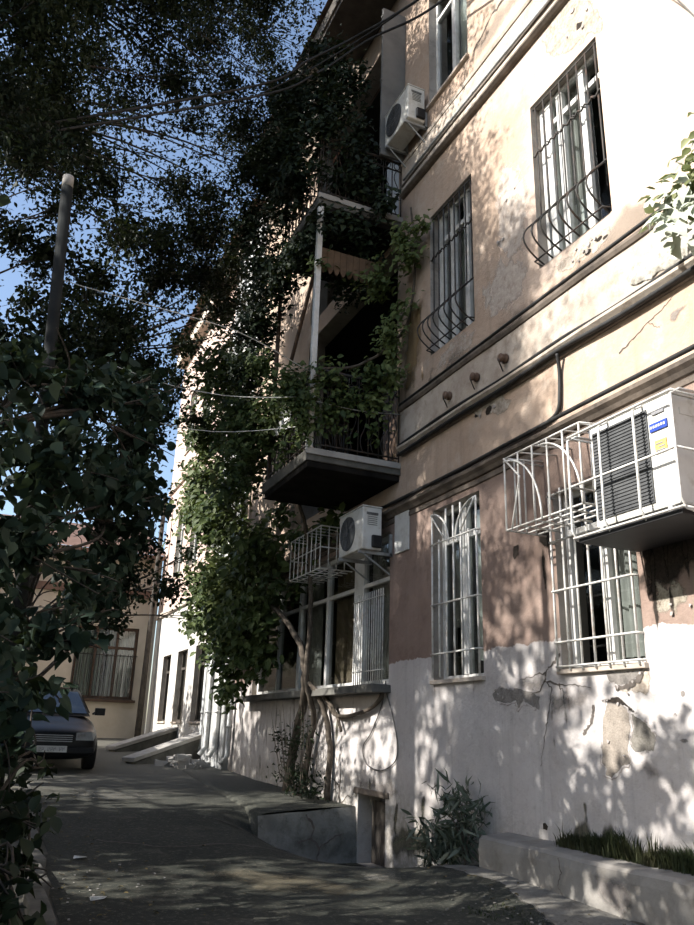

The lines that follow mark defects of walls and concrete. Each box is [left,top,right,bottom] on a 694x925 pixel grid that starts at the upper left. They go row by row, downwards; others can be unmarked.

flaking render [542,0,603,56]
crack [619,291,677,354]
damp [639,538,694,625]
flaking render [493,679,542,712]
crack [519,653,591,765]
flaking render [582,669,657,780]